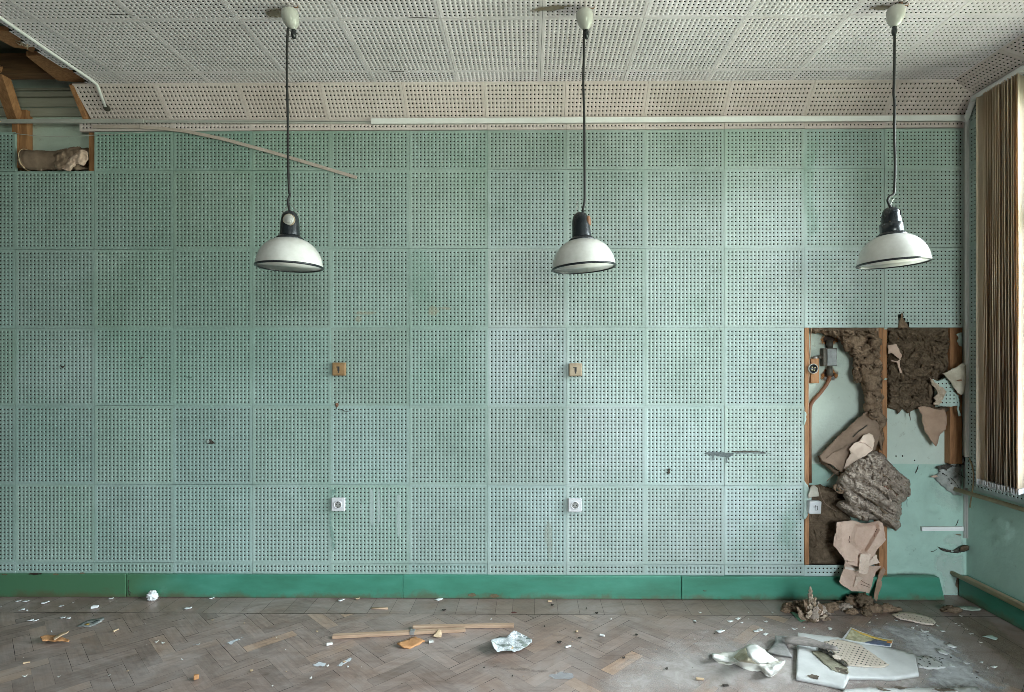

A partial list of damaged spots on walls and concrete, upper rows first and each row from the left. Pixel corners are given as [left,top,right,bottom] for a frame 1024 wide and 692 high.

spalling [931,455,965,496]